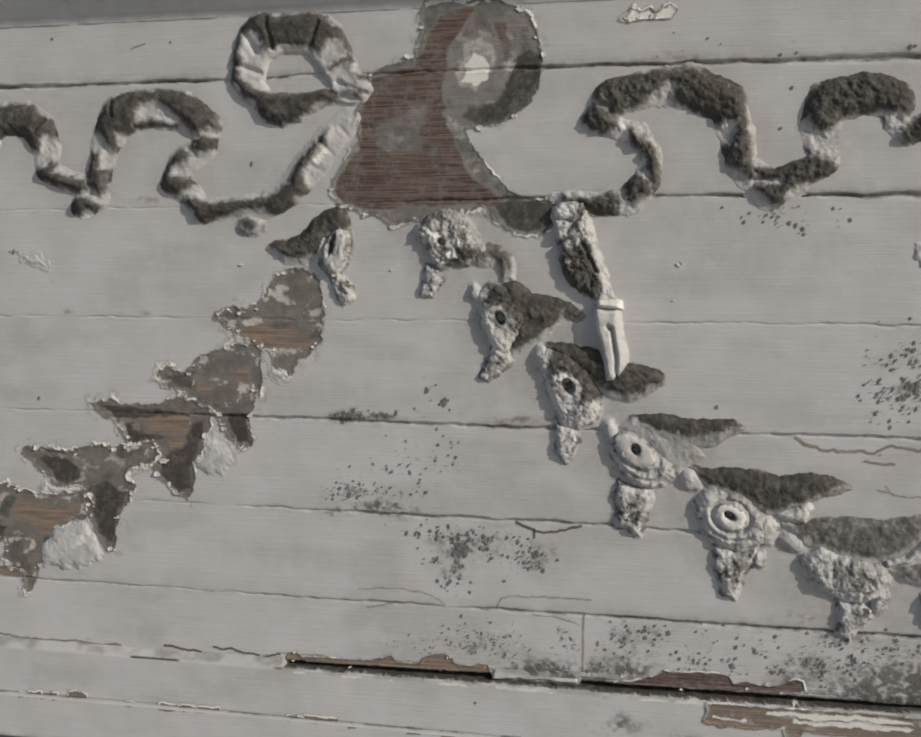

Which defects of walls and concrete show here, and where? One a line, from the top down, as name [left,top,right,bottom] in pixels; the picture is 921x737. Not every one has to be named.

peeling [329,0,556,238]
leakage [857,340,921,430]
peeling [0,263,326,597]
crack [795,436,921,466]
peeling [287,651,490,672]
leakage [381,614,671,684]
peeling [613,668,921,737]
leakage [669,624,921,705]